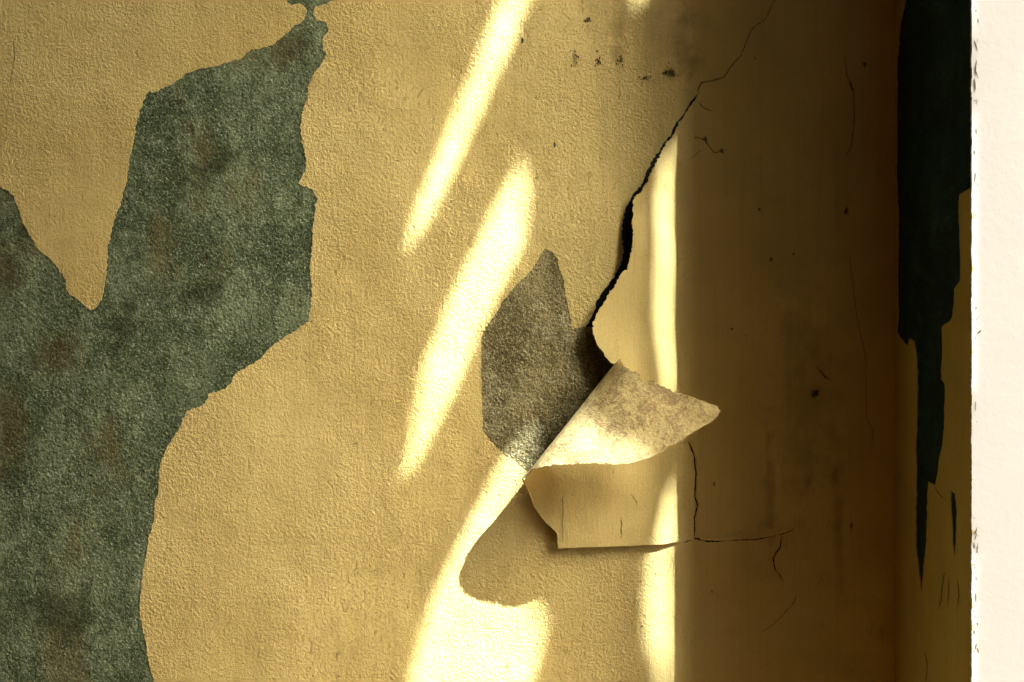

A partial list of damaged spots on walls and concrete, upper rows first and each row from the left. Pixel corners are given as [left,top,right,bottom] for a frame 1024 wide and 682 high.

peeling [0,0,333,682]
peeling [480,98,720,549]
crack [586,0,775,327]
crack [684,439,794,581]
peeling [897,0,979,583]